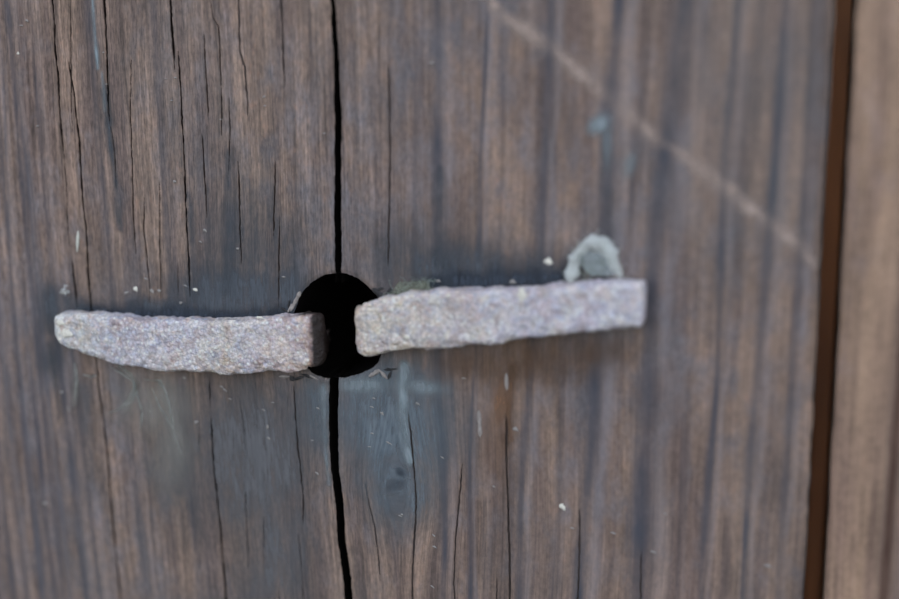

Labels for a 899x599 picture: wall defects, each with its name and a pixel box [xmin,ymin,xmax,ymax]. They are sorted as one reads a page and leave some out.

crack [52,0,93,312]
crack [330,0,354,283]
crack [199,377,227,599]
crack [329,354,367,599]
crack [365,485,380,574]
crack [408,414,417,599]
crack [453,469,462,599]
crack [496,415,511,599]